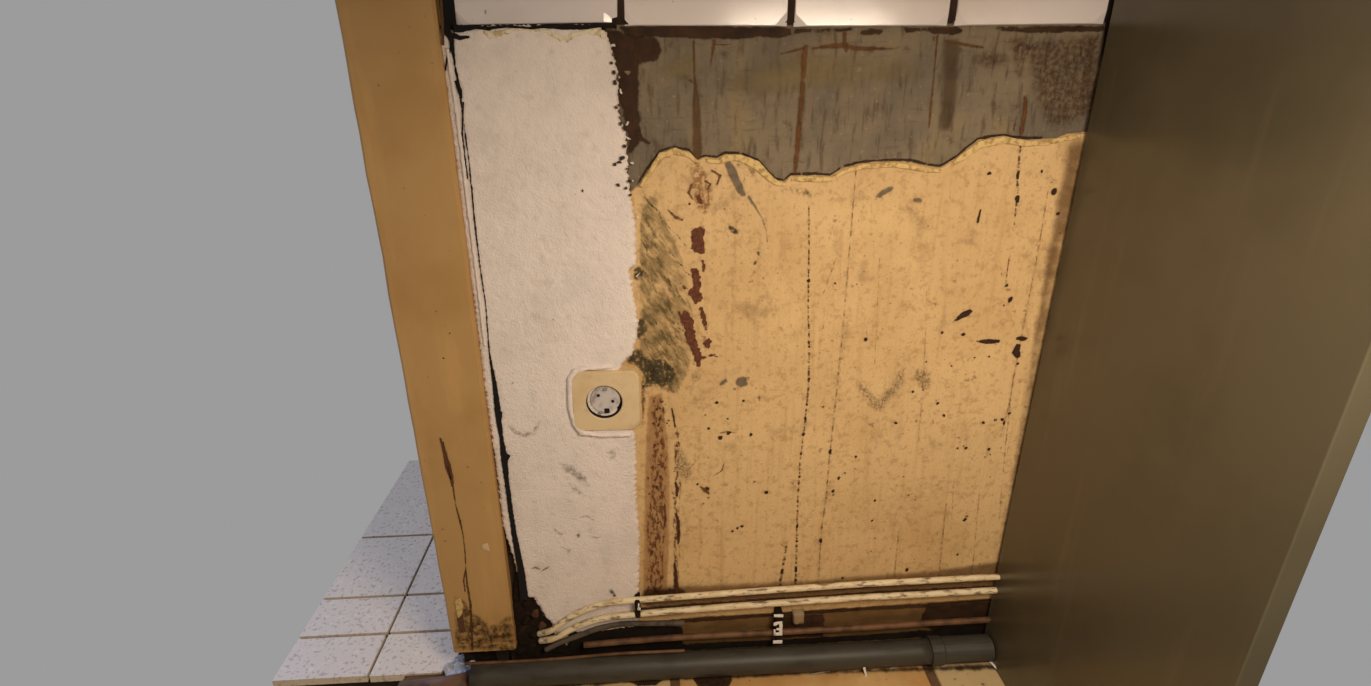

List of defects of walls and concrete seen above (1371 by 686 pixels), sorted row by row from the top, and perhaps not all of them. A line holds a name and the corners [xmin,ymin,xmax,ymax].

mould [628,319,675,413]
peeling [605,22,1105,391]